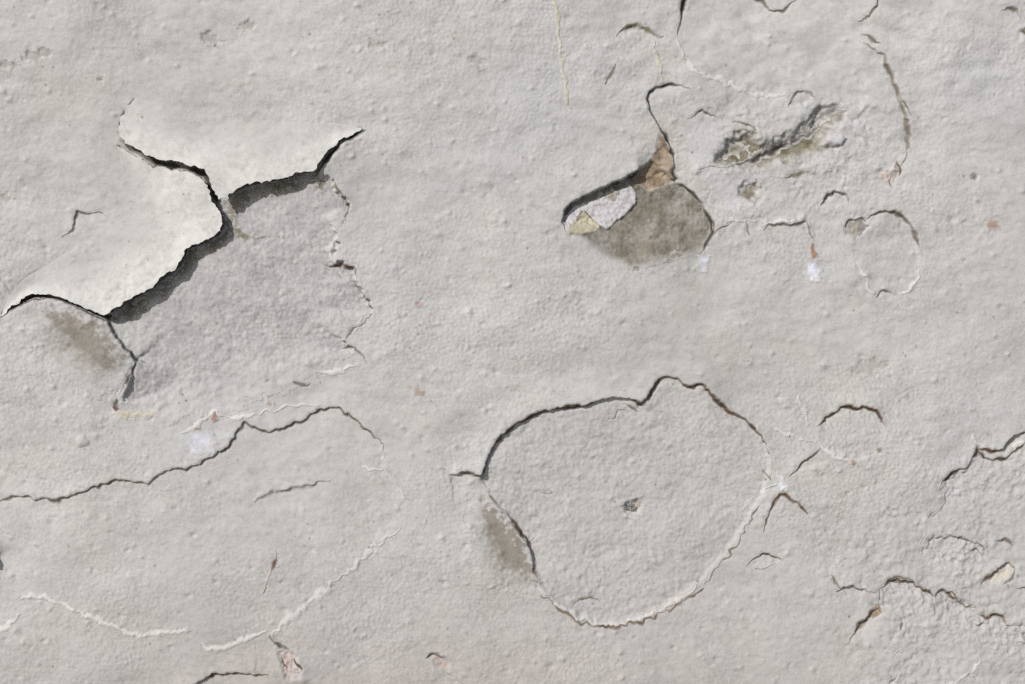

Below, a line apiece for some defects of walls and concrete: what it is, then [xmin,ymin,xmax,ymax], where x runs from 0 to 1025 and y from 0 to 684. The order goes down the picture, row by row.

crack [676,0,688,36]
crack [753,0,796,14]
crack [858,0,912,166]
crack [687,108,716,119]
peeling [560,81,859,272]
crack [730,217,814,241]
flaking render [1,97,375,427]
crack [0,405,408,504]
crack [263,550,280,593]
crack [831,431,1025,684]
crack [196,671,268,684]